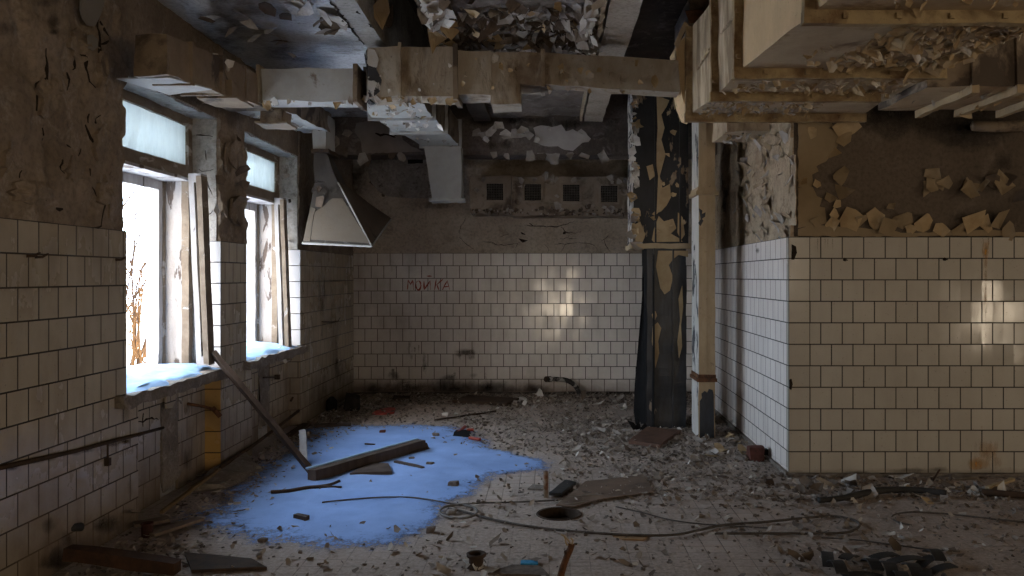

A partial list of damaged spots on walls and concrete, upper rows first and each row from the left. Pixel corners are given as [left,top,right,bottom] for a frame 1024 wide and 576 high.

crack [35,20,109,140]
peeling [198,0,348,58]
peeling [417,0,607,72]
crack [59,114,106,229]
peeling [213,135,250,227]
peeling [472,121,609,165]
peeling [619,74,706,241]
peeling [722,122,1024,260]